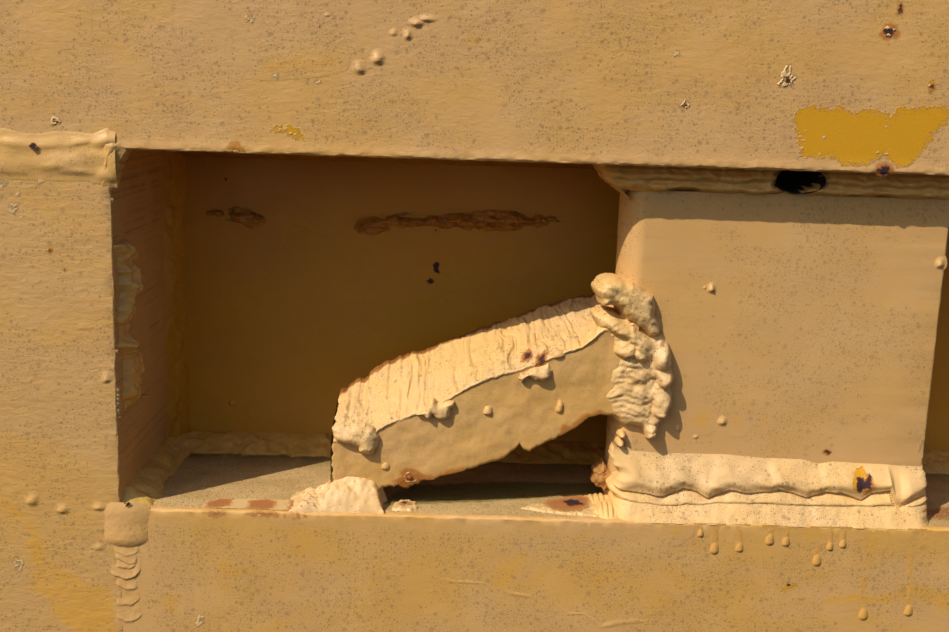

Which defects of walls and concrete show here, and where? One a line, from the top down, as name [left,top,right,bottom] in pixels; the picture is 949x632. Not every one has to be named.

corrosion [880,24,899,39]
peeling [792,104,949,168]
corrosion [875,163,893,177]
corrosion [330,293,595,483]
corrosion [394,467,463,486]
corrosion [852,466,874,494]
peeling [521,495,600,517]